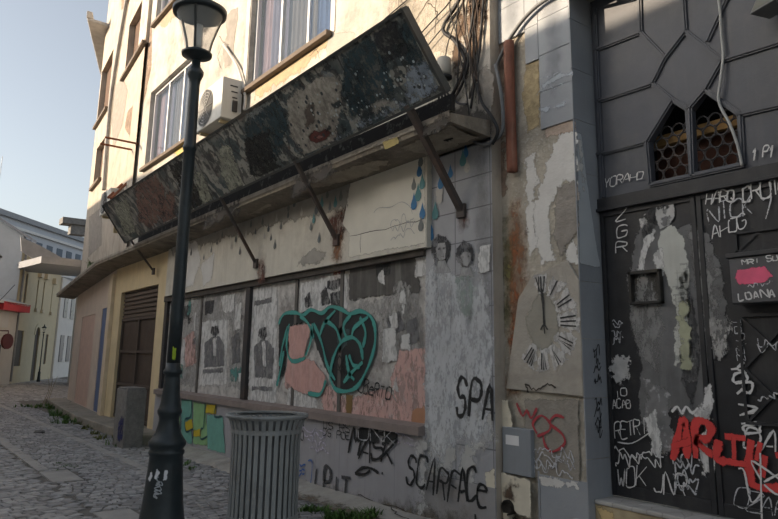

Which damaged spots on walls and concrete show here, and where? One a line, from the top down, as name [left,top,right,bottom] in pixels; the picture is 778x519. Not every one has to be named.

spalling [223,7,238,68]
peeling [522,60,600,267]
rust [506,202,527,349]
flaking render [485,398,580,519]